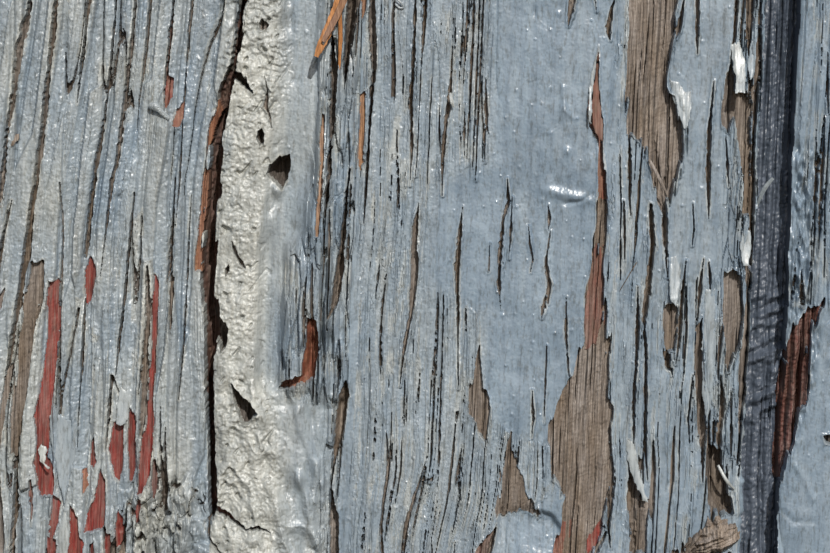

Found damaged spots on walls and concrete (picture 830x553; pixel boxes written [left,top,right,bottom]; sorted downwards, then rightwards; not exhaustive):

peeling [625,0,692,215]
peeling [547,51,613,553]
peeling [116,387,132,426]
peeling [772,298,824,478]
peeling [38,414,77,553]
peeling [475,432,540,553]
peeling [776,501,784,553]